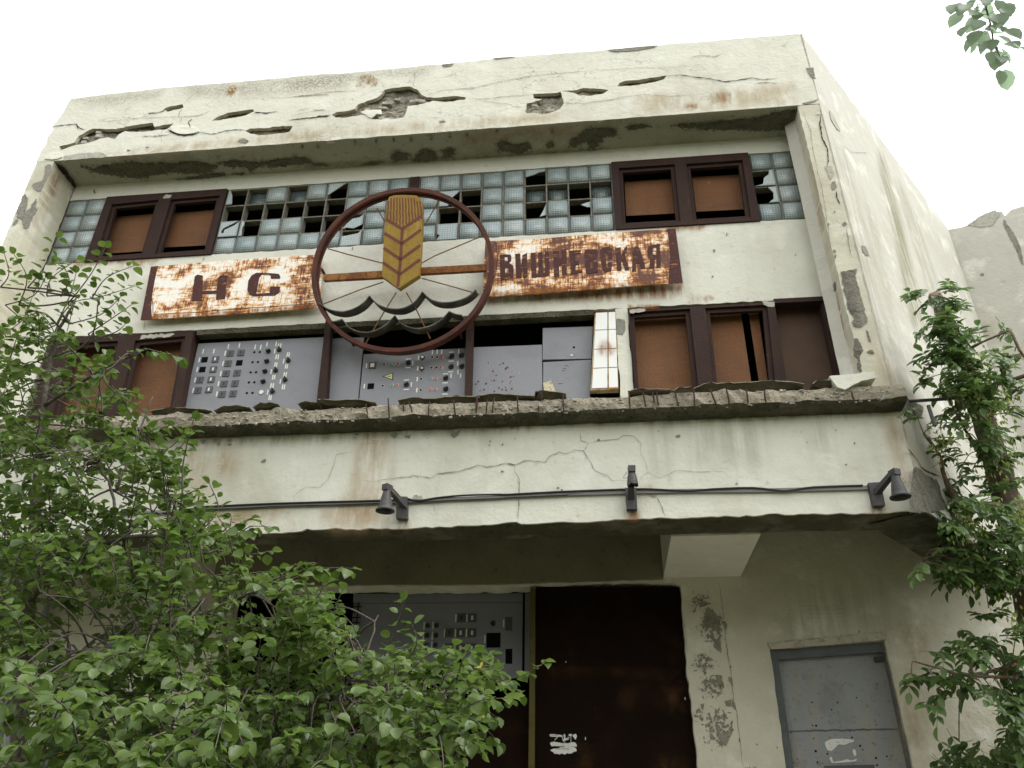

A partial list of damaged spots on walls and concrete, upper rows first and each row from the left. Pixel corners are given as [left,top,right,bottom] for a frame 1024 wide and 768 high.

spalling [212,109,254,121]
spalling [332,86,466,119]
spalling [525,76,666,114]
crack [431,52,777,107]
peeling [13,164,52,229]
peeling [59,123,329,180]
peeling [361,147,459,165]
crack [804,108,864,256]
peeling [833,269,874,372]
spalling [628,389,695,409]
crack [365,435,728,515]
peeling [688,591,740,750]